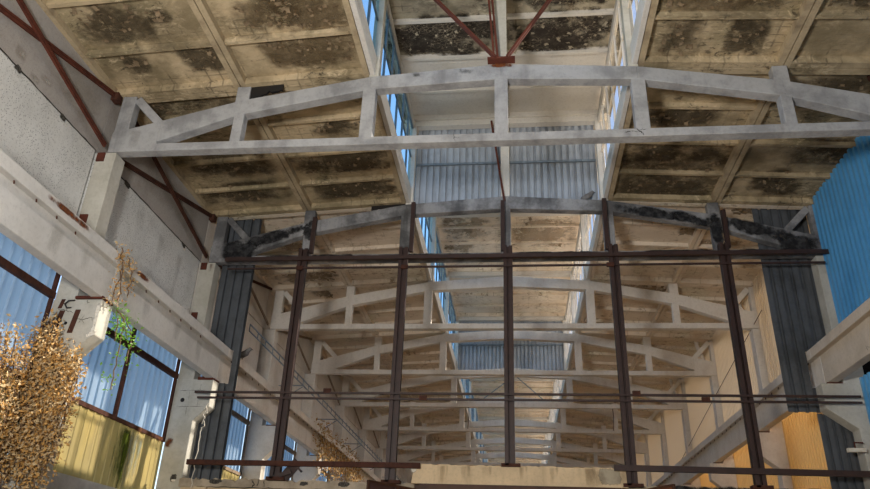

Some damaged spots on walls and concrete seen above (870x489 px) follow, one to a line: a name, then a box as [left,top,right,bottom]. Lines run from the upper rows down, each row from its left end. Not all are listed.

corrosion [50,197,88,230]